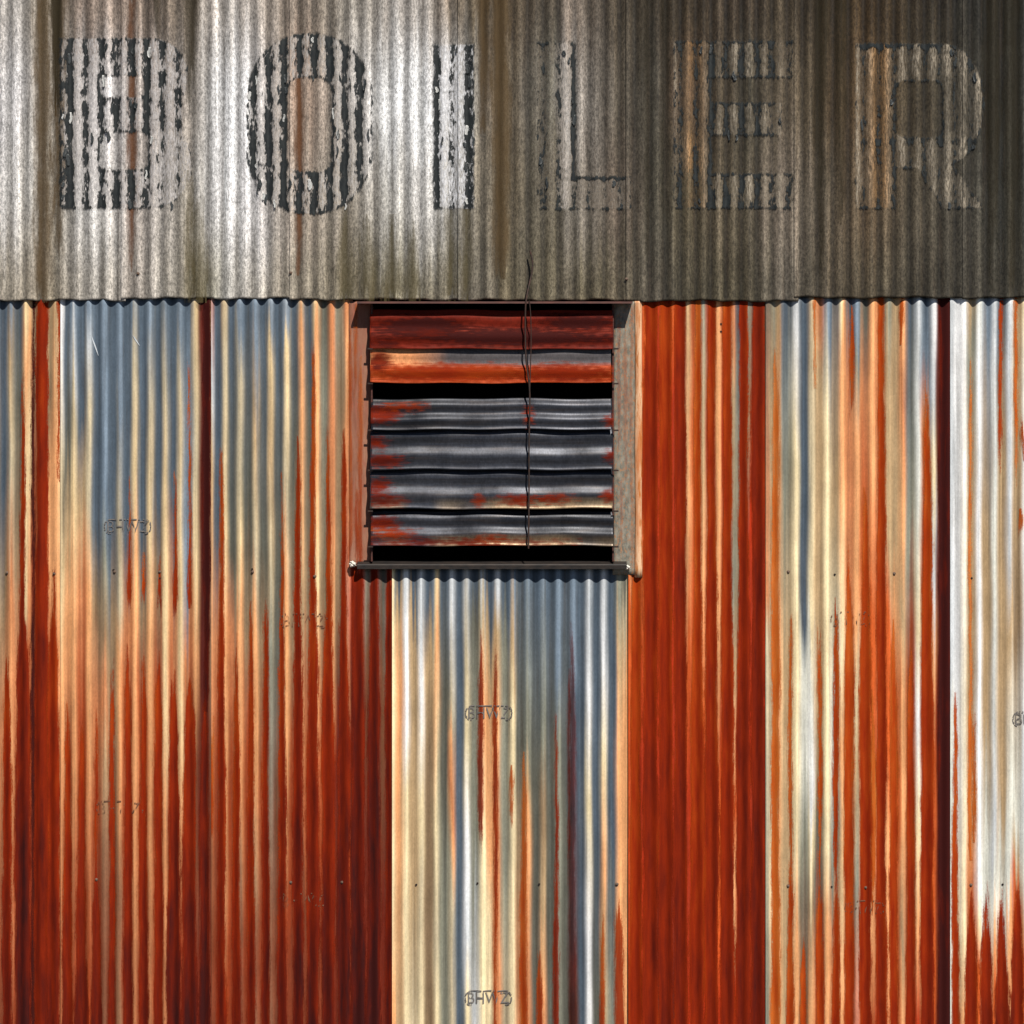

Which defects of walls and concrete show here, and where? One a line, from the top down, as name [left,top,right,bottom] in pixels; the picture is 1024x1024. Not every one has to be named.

peeling [58,36,193,210]
peeling [246,32,374,216]
peeling [432,44,476,210]
peeling [537,41,632,211]
peeling [673,39,794,210]
peeling [855,42,985,210]
corrosion [1,298,614,1024]
corrosion [599,297,1024,1024]